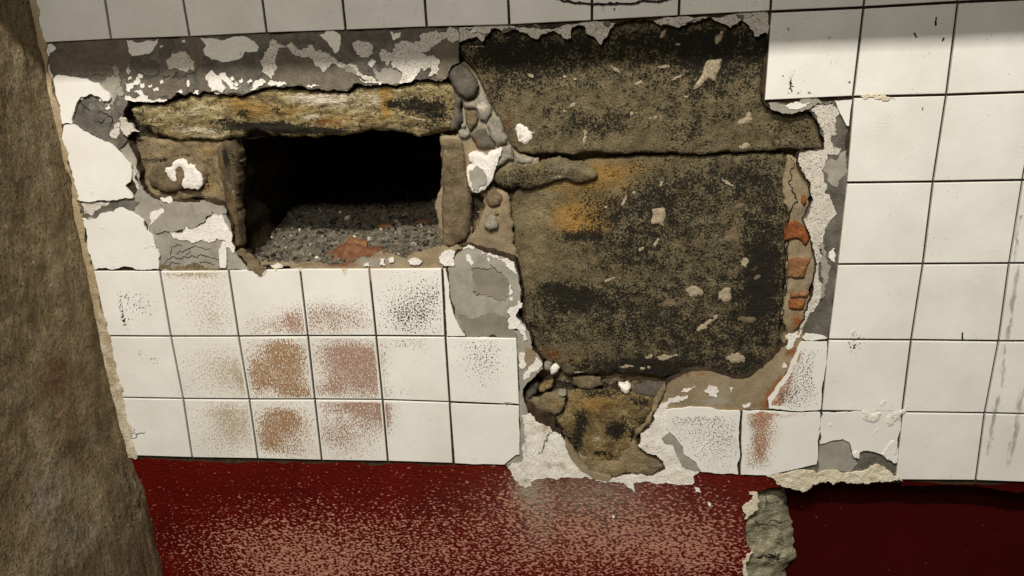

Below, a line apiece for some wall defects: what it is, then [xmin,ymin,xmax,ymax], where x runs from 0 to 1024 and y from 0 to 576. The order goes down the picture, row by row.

spalling [654,11,769,44]
spalling [46,21,615,276]
crack [162,216,218,266]
spalling [438,98,903,576]
rust [243,338,399,459]
rust [747,412,782,466]